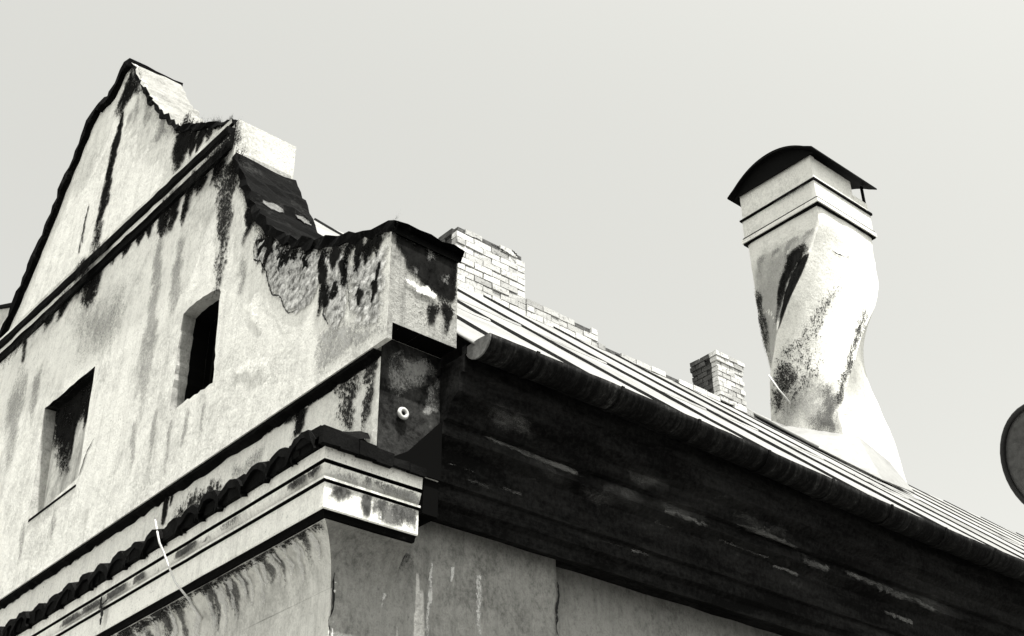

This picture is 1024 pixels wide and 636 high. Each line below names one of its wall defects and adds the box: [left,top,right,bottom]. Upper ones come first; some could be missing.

water stain [91,98,213,251]
water stain [212,140,246,297]
water stain [238,228,266,294]
spalling [253,235,390,375]
water stain [317,239,381,316]
water stain [441,299,454,334]
water stain [755,230,869,433]
water stain [68,396,91,459]
water stain [345,378,373,431]
water stain [199,569,248,630]
water stain [259,551,286,582]